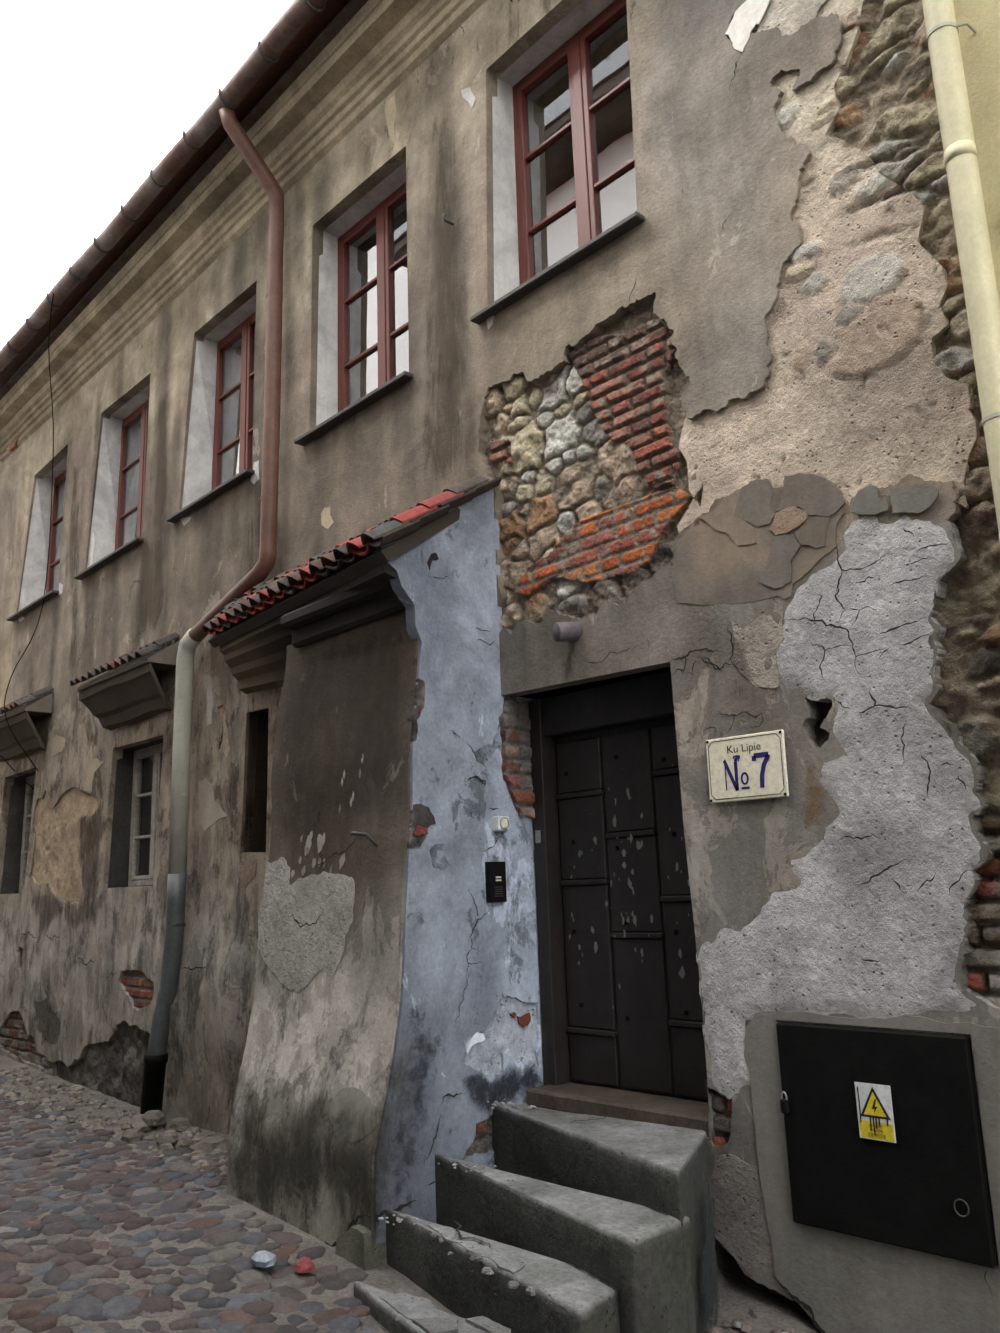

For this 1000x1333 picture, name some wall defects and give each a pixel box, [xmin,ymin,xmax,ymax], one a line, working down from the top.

spalling [485,0,1000,1007]
crack [781,528,966,797]
crack [840,834,967,893]
flaking render [121,970,154,1008]
spalling [0,1011,150,1108]
leakage [229,1082,414,1231]
leakage [390,1036,439,1119]
flaking render [705,1080,732,1146]